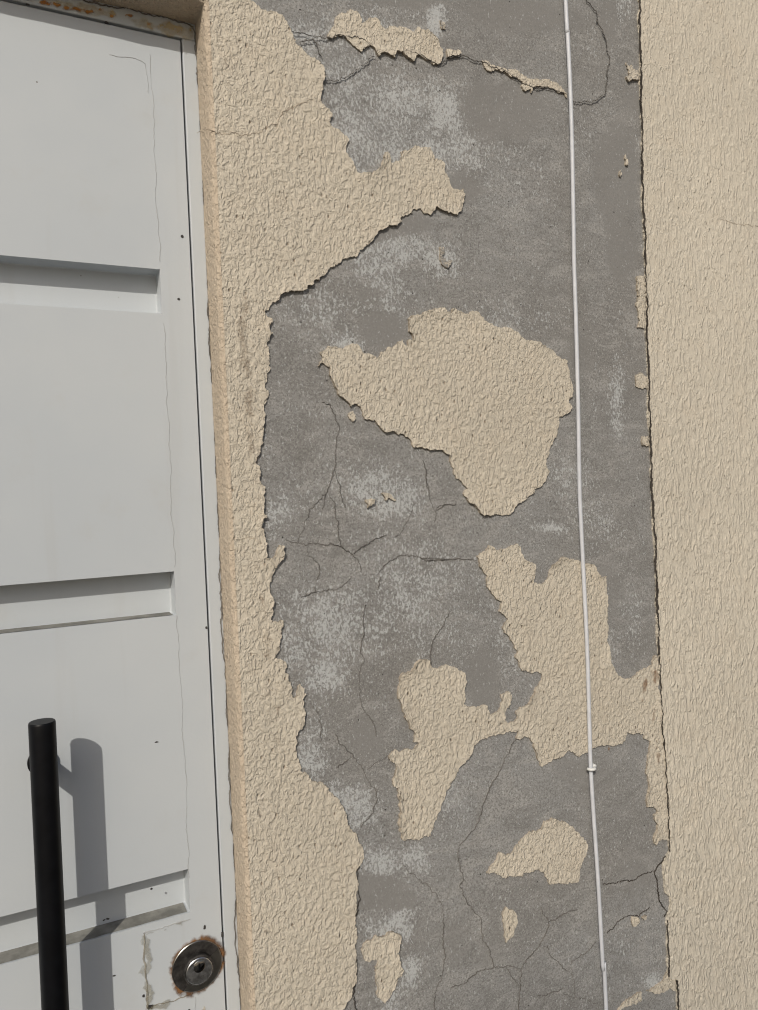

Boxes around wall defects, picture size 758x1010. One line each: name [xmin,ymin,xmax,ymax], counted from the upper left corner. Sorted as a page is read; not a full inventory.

rust [40,0,133,17]
crack [199,31,374,136]
crack [286,402,476,598]
peeling [251,0,677,1010]
crack [403,0,680,1010]
crack [358,608,376,733]
crack [313,706,387,828]
rust [170,936,225,997]